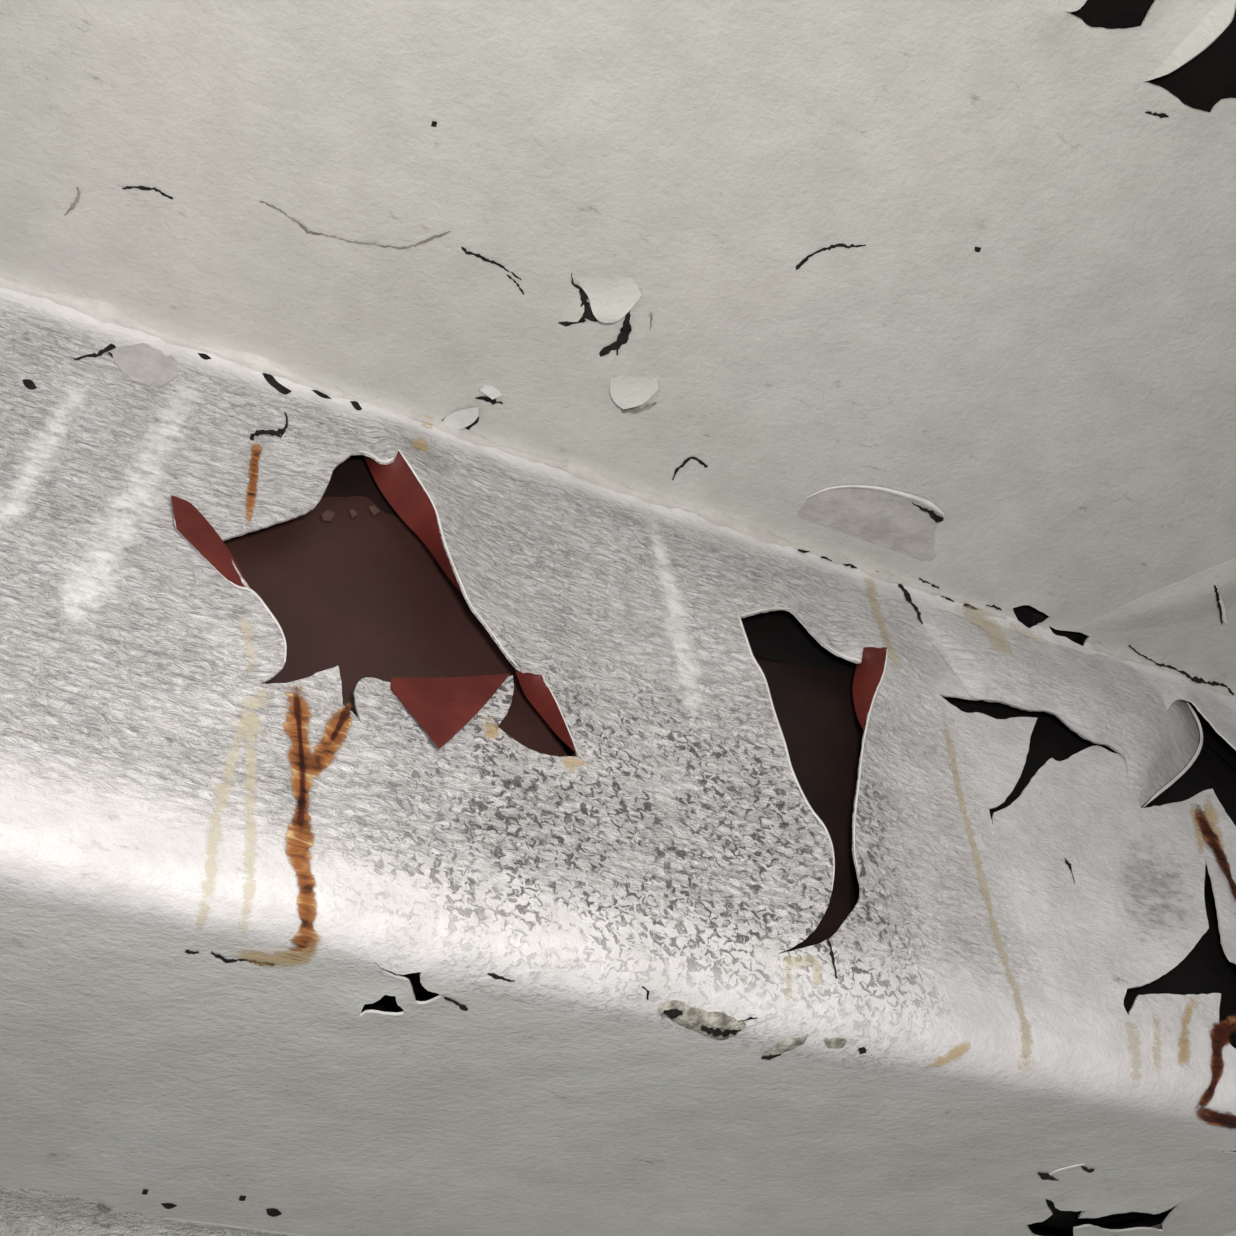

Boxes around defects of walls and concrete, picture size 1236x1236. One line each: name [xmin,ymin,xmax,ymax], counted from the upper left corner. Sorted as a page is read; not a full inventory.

peeling [1070,0,1154,29]
peeling [1146,0,1236,112]
crack [260,200,524,295]
crack [796,243,866,270]
peeling [171,448,580,757]
crack [1129,645,1234,695]
rust [236,688,352,966]
peeling [739,607,888,978]
peeling [945,698,1119,819]
rust [1192,804,1236,899]
peeling [1124,863,1236,1049]
rust [1197,1017,1236,1129]